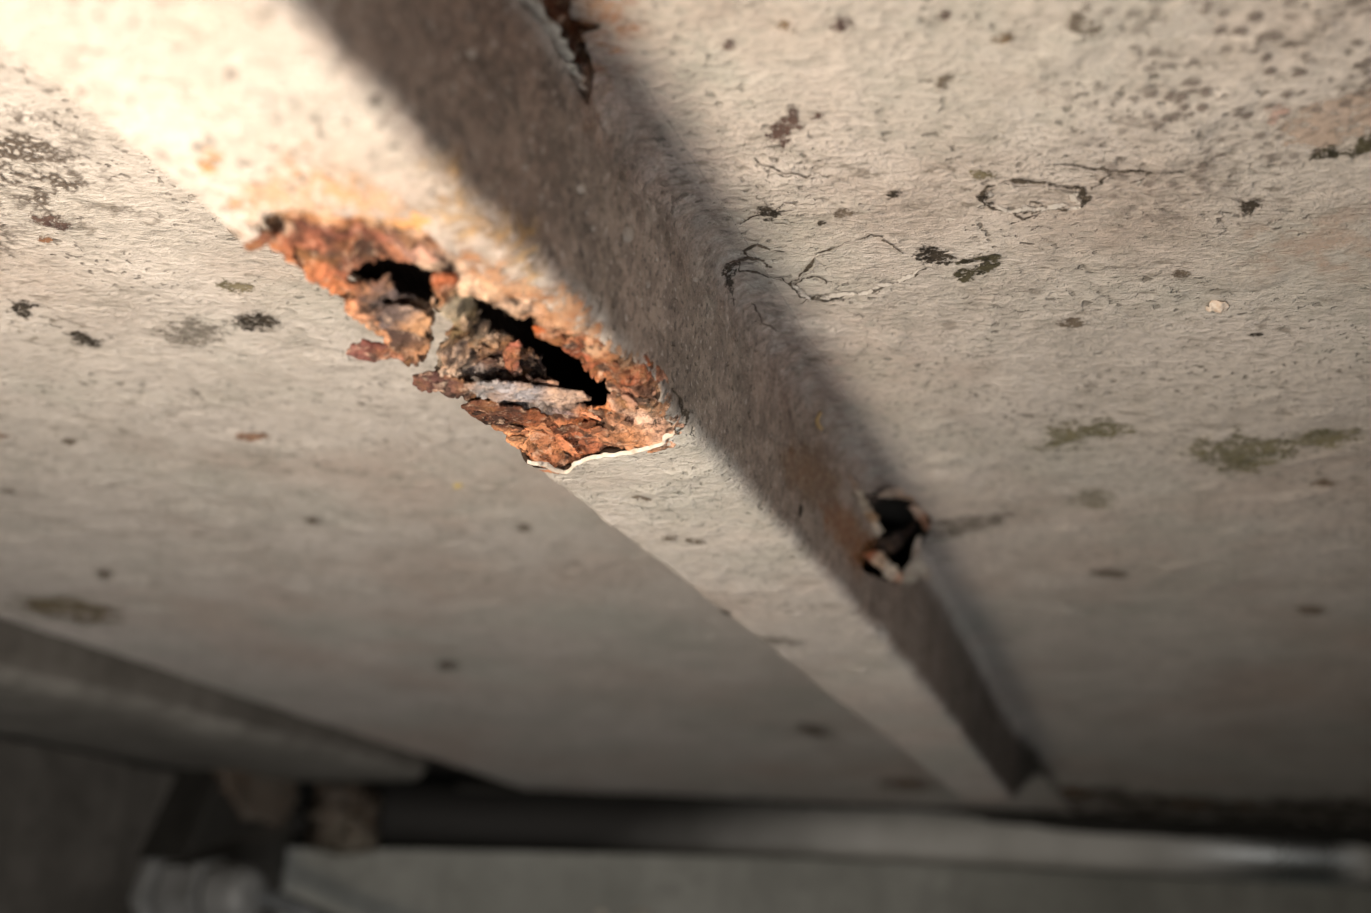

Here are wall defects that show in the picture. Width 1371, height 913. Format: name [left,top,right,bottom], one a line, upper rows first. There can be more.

rust [541,0,597,86]
peeling [243,229,278,252]
peeling [381,219,415,229]
crack [753,158,829,181]
crack [975,164,1184,220]
crack [722,234,927,332]
peeling [346,302,433,367]
rust [267,209,684,474]
peeling [461,324,592,428]